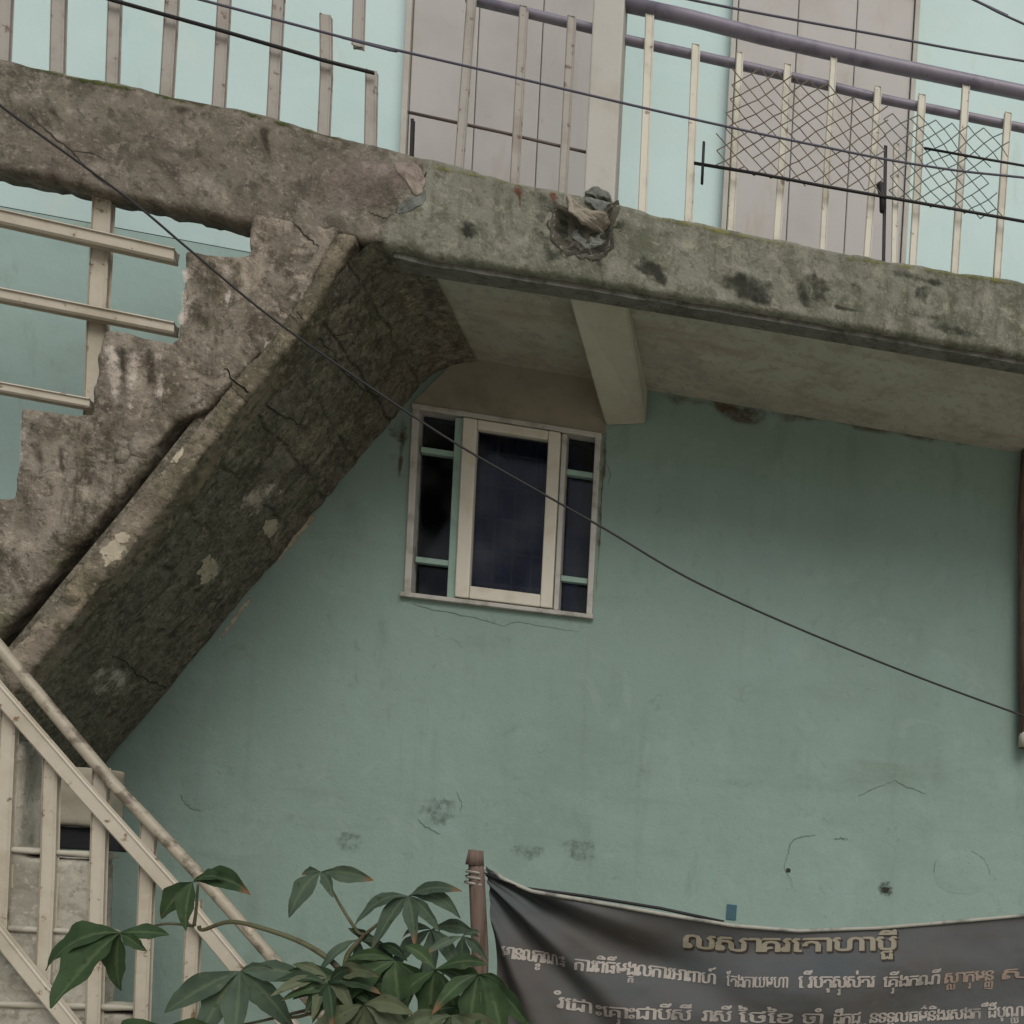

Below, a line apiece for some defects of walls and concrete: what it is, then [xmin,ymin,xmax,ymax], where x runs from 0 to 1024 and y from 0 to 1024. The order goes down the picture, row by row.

spalling [330,160,426,214]
spalling [540,186,622,261]
leakage [638,260,666,284]
leakage [726,272,770,304]
leakage [799,274,854,311]
crack [224,368,306,428]
peeling [263,518,279,539]
peeling [100,532,134,567]
peeling [196,554,219,584]
crack [412,603,579,632]